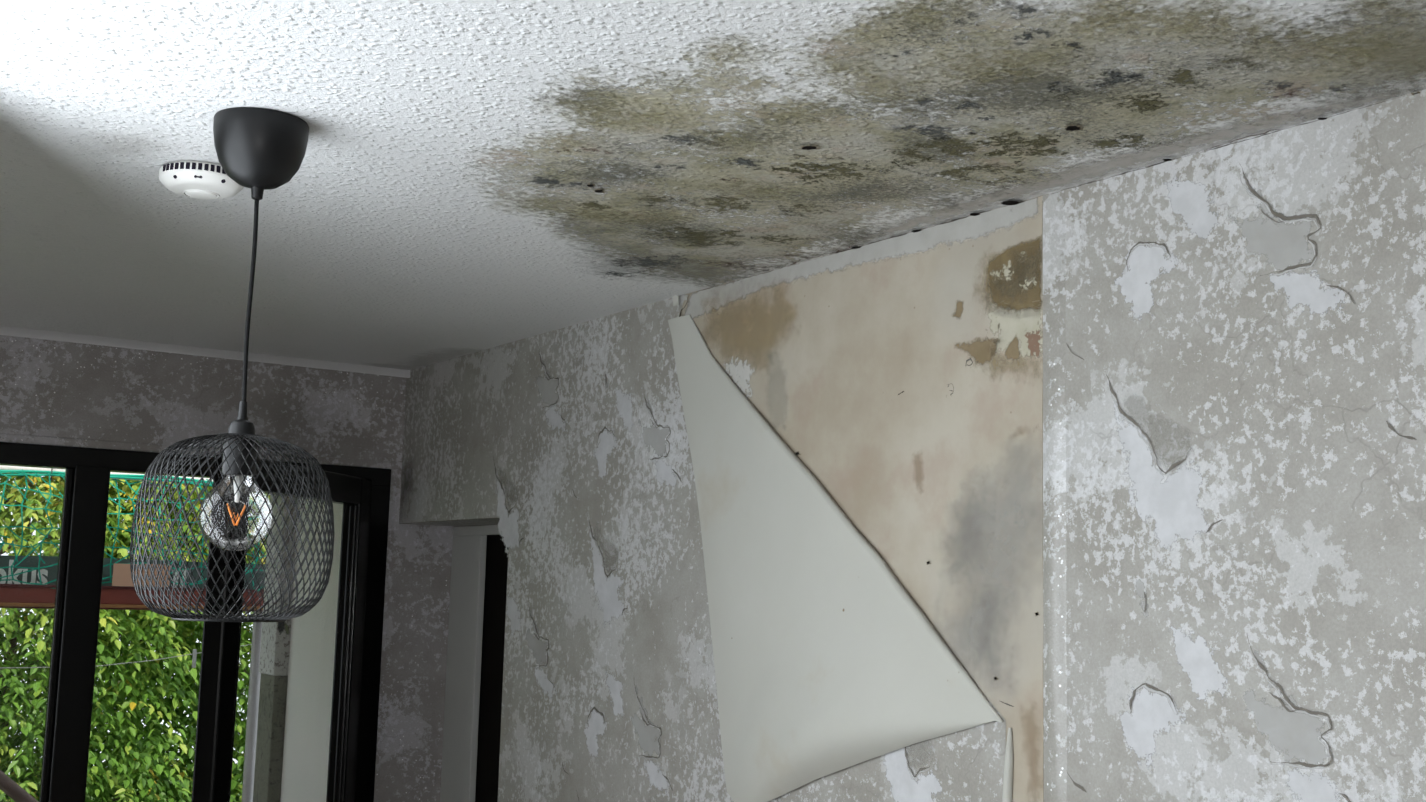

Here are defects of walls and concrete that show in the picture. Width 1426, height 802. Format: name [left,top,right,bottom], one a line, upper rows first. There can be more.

mould [477,0,1426,286]
damp [953,301,963,318]
damp [956,337,1024,371]
damp [984,238,1042,311]
peeling [1165,163,1355,314]
peeling [594,388,681,487]
peeling [1105,375,1223,562]
peeling [572,489,628,628]
peeling [1170,626,1228,701]
peeling [883,747,942,802]
peeling [1120,683,1186,773]
peeling [1243,635,1351,802]